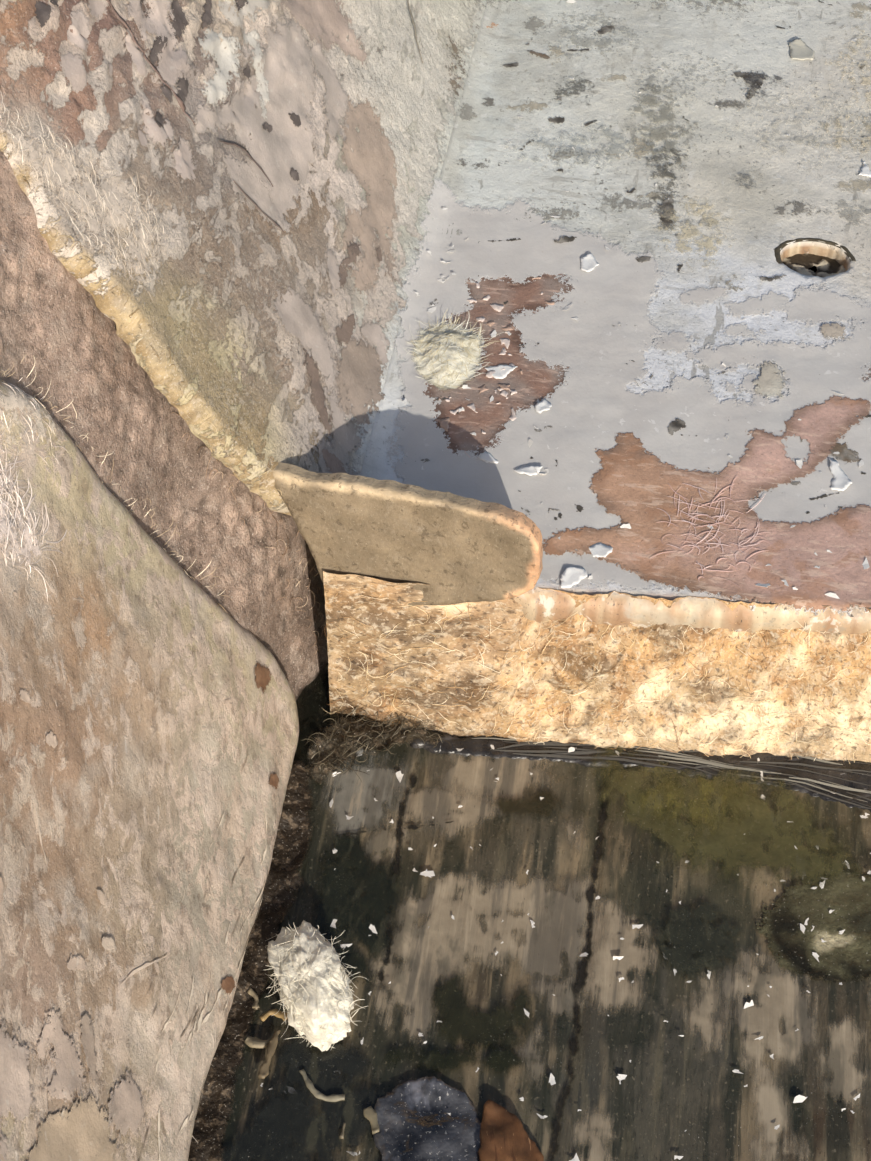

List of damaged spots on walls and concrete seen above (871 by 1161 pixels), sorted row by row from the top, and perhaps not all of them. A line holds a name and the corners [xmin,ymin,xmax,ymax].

spalling [35,0,59,28]
peeling [59,0,109,93]
crack [106,0,195,125]
crack [219,140,285,233]
peeling [124,0,871,616]
peeling [46,731,58,748]
peeling [67,954,87,973]
peeling [102,936,117,952]